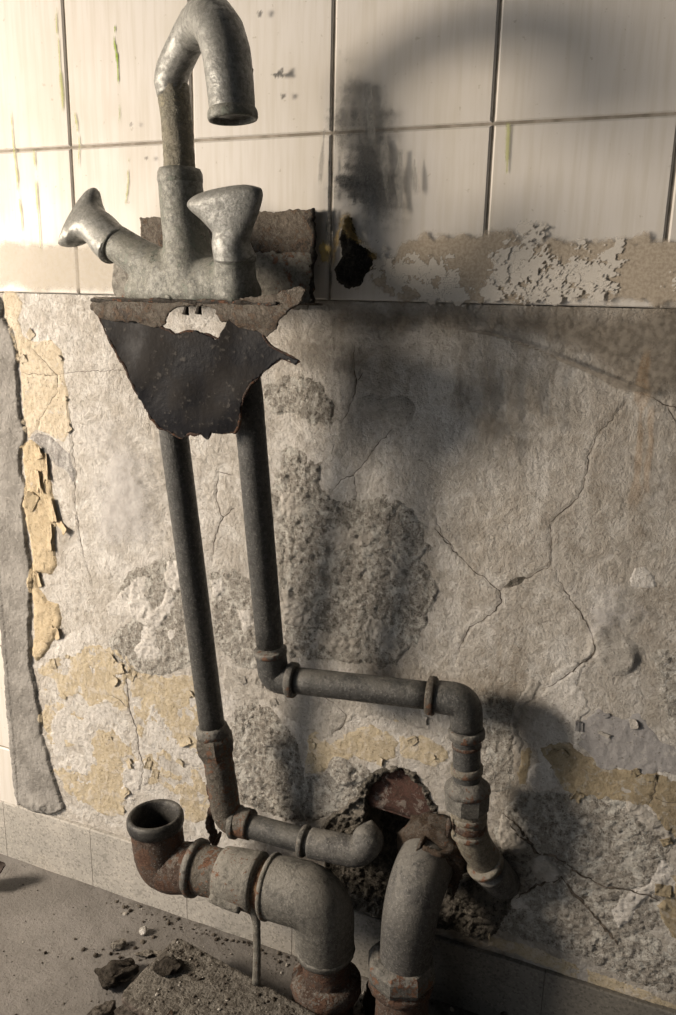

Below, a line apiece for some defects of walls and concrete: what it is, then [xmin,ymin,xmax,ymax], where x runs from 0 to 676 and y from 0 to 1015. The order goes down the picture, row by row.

damp [319,81,417,214]
damp [339,221,676,394]
spalling [2,291,210,823]
spalling [263,373,336,426]
spalling [271,444,438,670]
crack [332,430,391,501]
spalling [504,577,526,588]
crack [435,395,676,688]
spalling [630,567,656,588]
spalling [208,568,449,918]
spalling [436,662,676,1009]
crack [503,813,658,945]